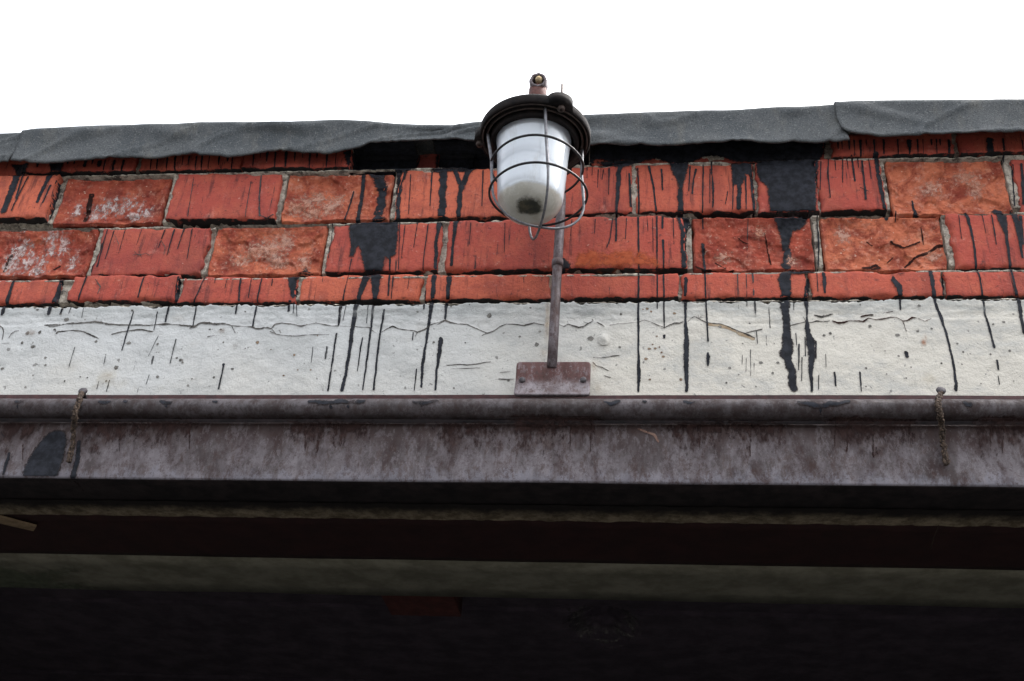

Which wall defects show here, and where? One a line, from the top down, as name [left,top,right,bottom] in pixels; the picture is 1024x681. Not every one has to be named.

crack [866,227,943,268]
leakage [47,229,125,318]
leakage [307,170,484,409]
crack [44,316,762,340]
leakage [737,215,851,415]
crack [790,311,932,330]
rust [81,418,198,453]
rust [286,418,373,452]
rust [509,413,603,454]
rust [661,421,792,456]
rust [825,414,918,458]
rust [972,415,1024,456]